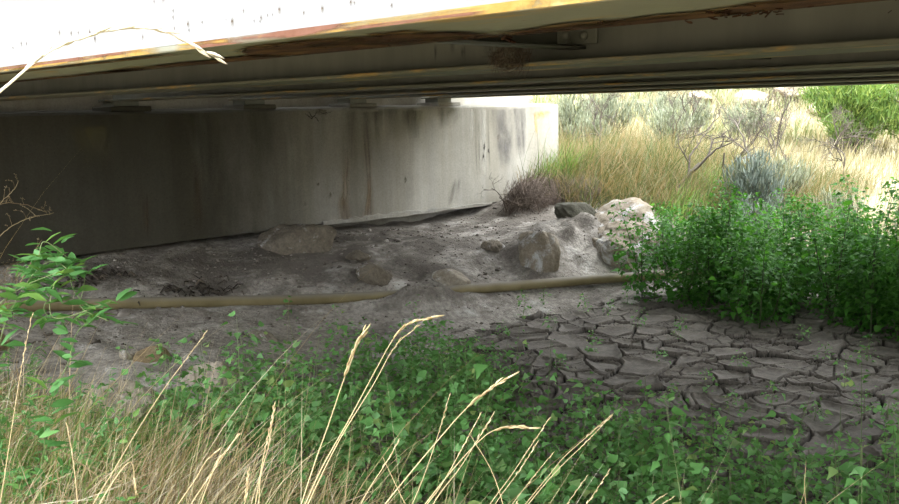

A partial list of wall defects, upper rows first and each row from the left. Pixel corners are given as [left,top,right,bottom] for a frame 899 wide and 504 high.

rust [0,0,896,84]
leakage [499,110,524,157]